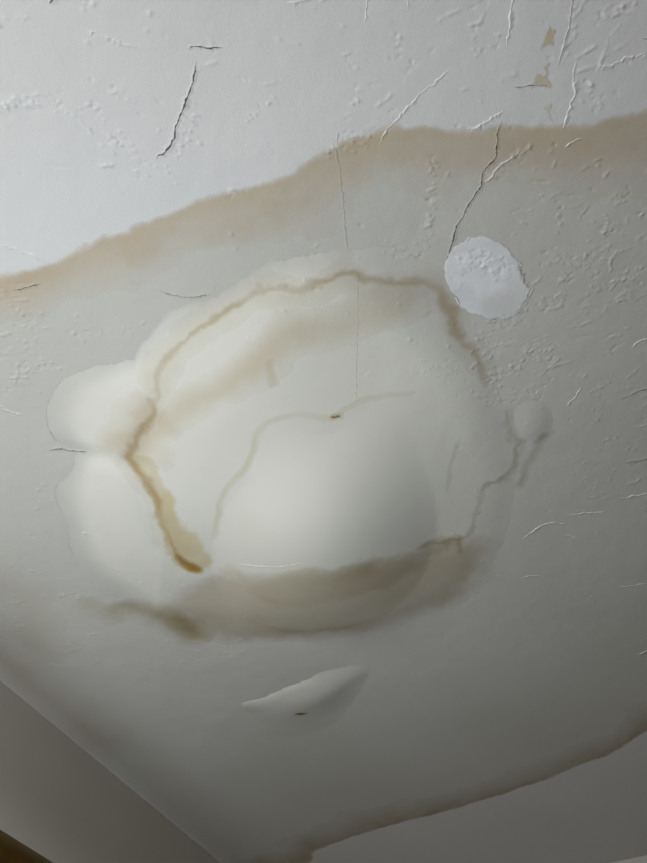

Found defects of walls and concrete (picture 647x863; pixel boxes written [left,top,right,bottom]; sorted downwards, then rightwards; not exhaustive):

damp [0,142,343,324]
crack [154,43,224,161]
crack [377,69,451,148]
damp [337,121,500,269]
crack [445,110,522,262]
peeling [444,235,533,323]
crack [506,0,515,48]
damp [484,108,647,201]
crack [513,0,647,148]
damp [0,183,647,863]